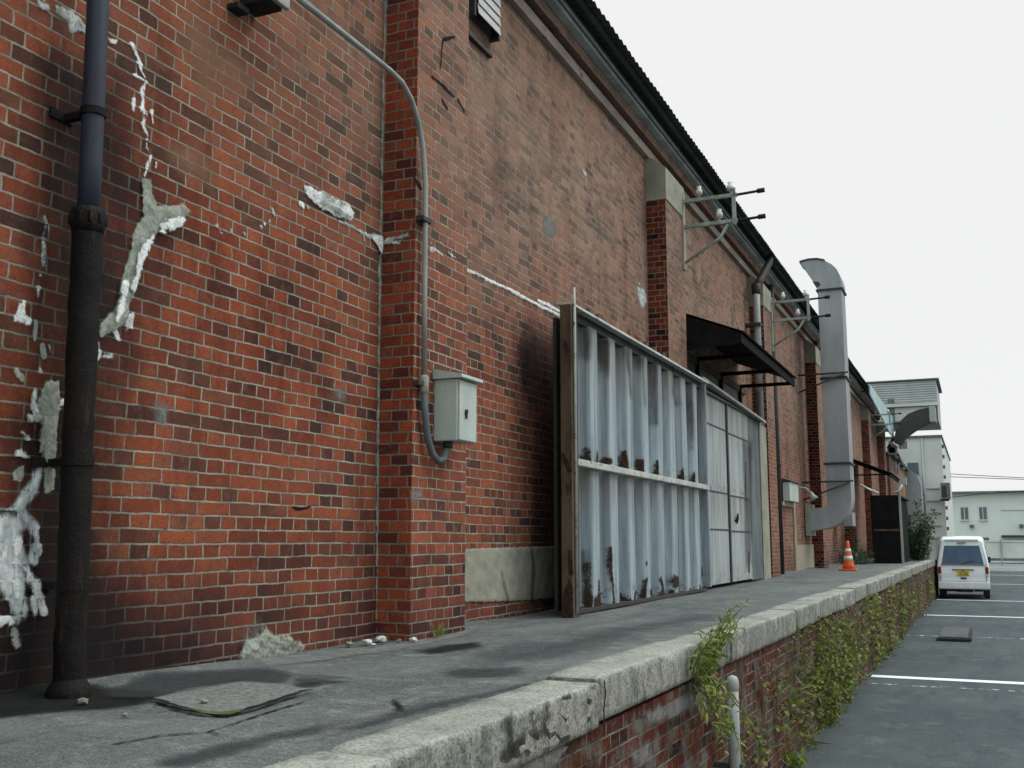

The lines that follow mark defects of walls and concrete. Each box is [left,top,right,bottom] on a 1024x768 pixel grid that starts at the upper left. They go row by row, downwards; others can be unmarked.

peeling [37,0,85,34]
peeling [14,300,51,374]
peeling [112,312,134,341]
corrosion [580,447,659,475]
peeling [0,509,48,649]
corrosion [563,547,703,618]